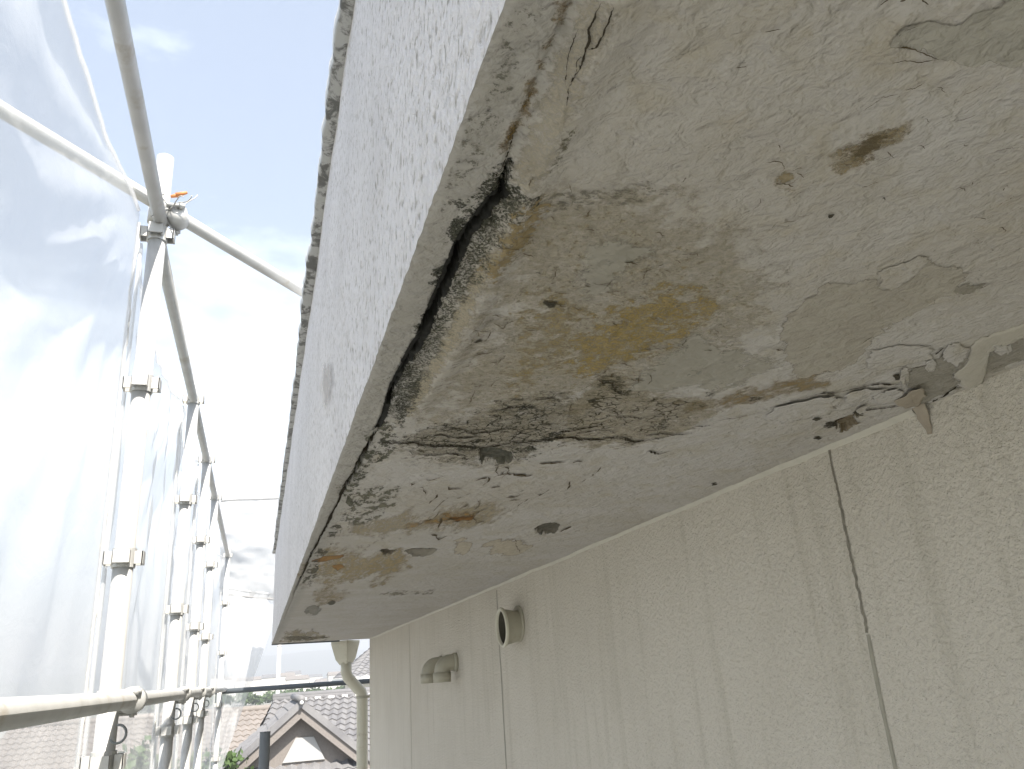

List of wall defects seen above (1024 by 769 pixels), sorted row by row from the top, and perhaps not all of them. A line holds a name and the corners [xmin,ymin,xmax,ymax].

crack [565,4,614,102]
water stain [329,42,669,537]
crack [299,135,726,580]
water stain [496,282,724,399]
peeling [720,348,969,440]
peeling [986,338,1024,374]